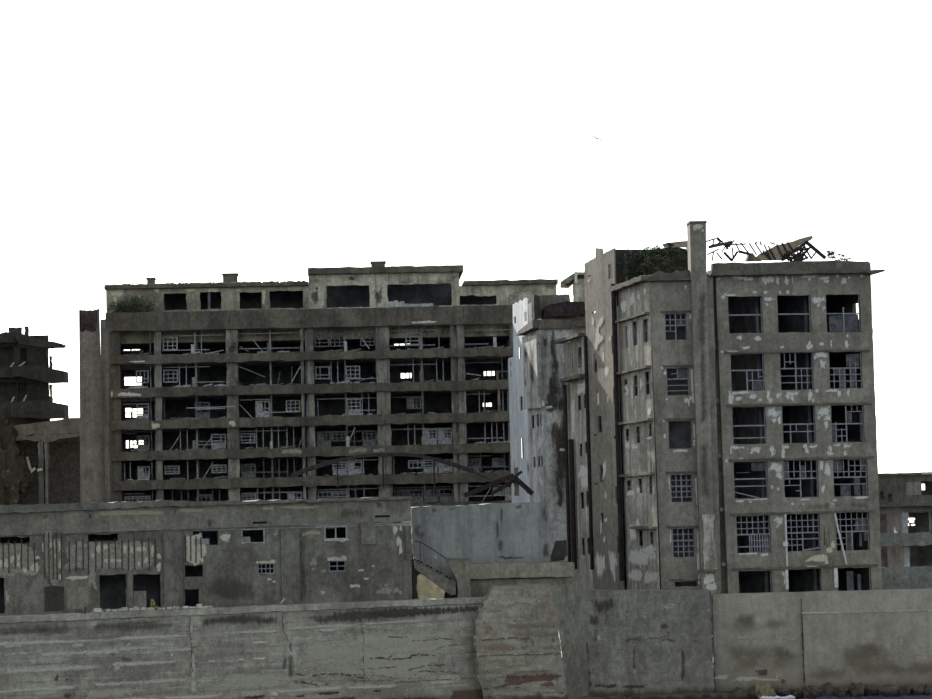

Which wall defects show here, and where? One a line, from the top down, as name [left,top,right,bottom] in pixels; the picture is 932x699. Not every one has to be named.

peeling [732,274,864,306]
peeling [592,316,611,377]
peeling [806,340,832,369]
water stain [543,331,566,506]
peeling [572,382,585,434]
peeling [684,369,694,407]
peeling [728,389,850,430]
spalling [0,529,162,591]
peeling [595,517,617,583]
peeling [627,518,658,585]
peeling [697,532,717,591]